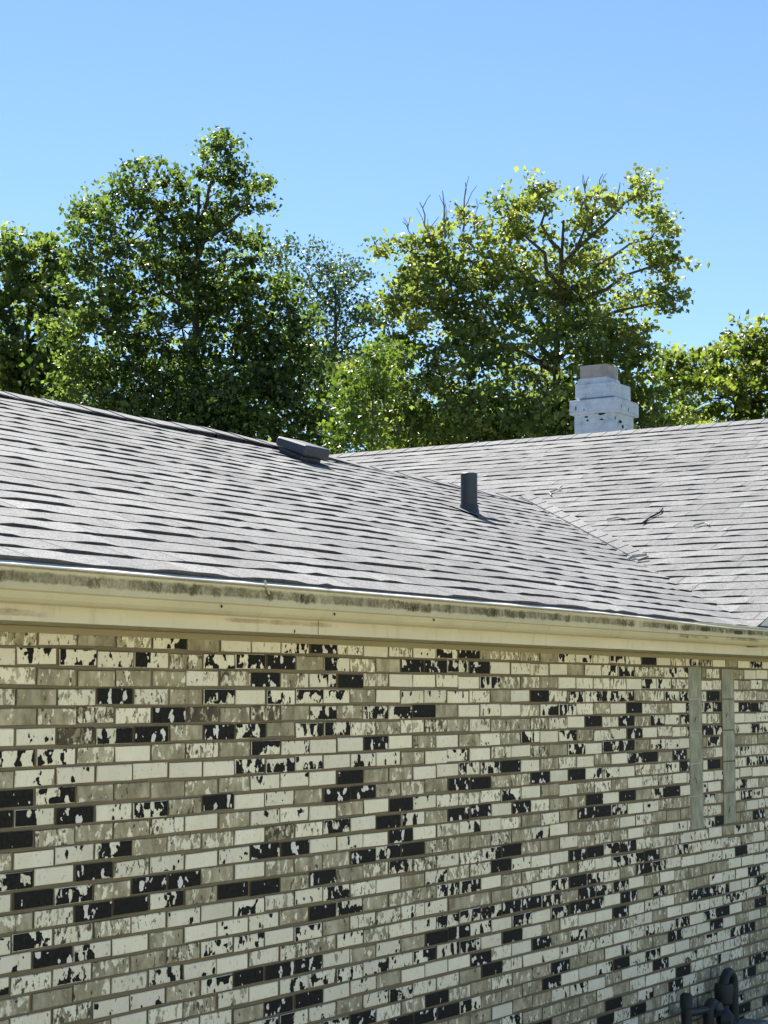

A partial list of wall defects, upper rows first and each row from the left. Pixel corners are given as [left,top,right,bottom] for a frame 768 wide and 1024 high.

damp [0,571,763,635]
peeling [18,647,159,667]
flaking render [402,649,500,688]
flaking render [0,734,94,850]
flaking render [98,708,186,744]
flaking render [205,644,363,825]
flaking render [325,737,397,803]
flaking render [449,749,557,873]
flaking render [531,654,696,807]
flaking render [0,840,201,922]
flaking render [202,779,768,1024]
flaking render [0,931,107,985]